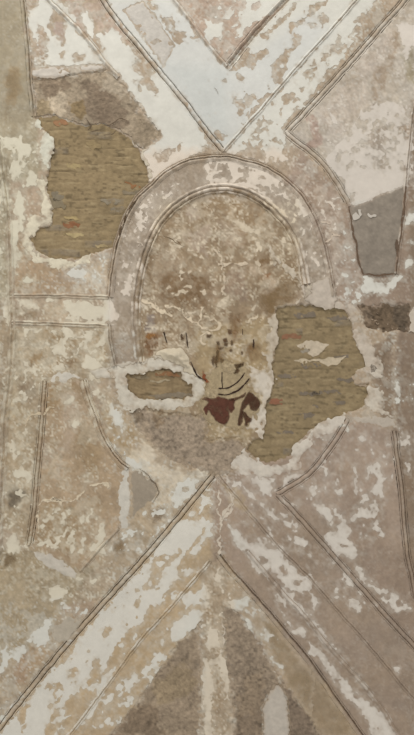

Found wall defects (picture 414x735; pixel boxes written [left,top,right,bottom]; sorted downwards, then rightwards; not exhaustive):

peeling [396,22,414,60]
peeling [318,101,414,220]
flaking render [0,0,376,448]
peeling [5,440,32,497]
peeling [124,451,142,471]
flaking render [213,215,414,735]
peeling [0,477,230,735]